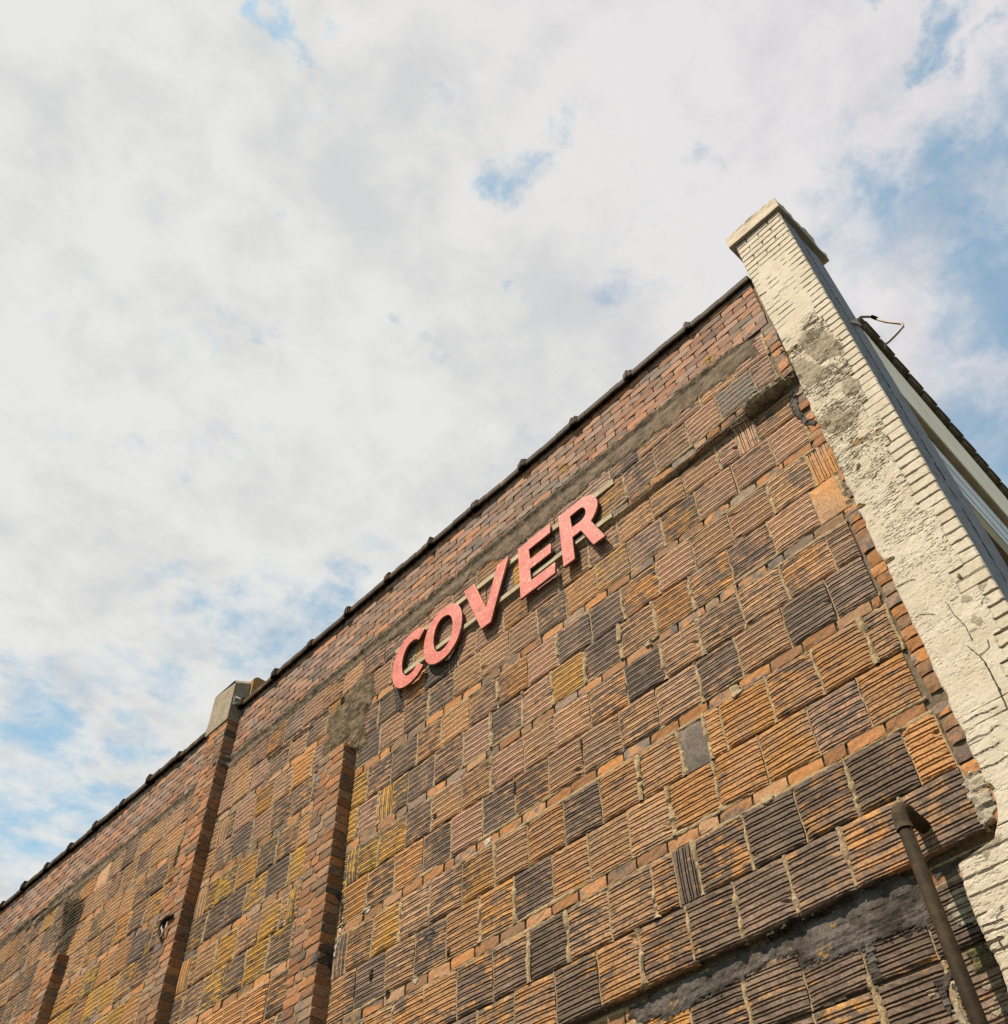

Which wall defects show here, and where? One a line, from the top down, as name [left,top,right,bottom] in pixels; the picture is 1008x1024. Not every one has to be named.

crack [916,596,1008,771]